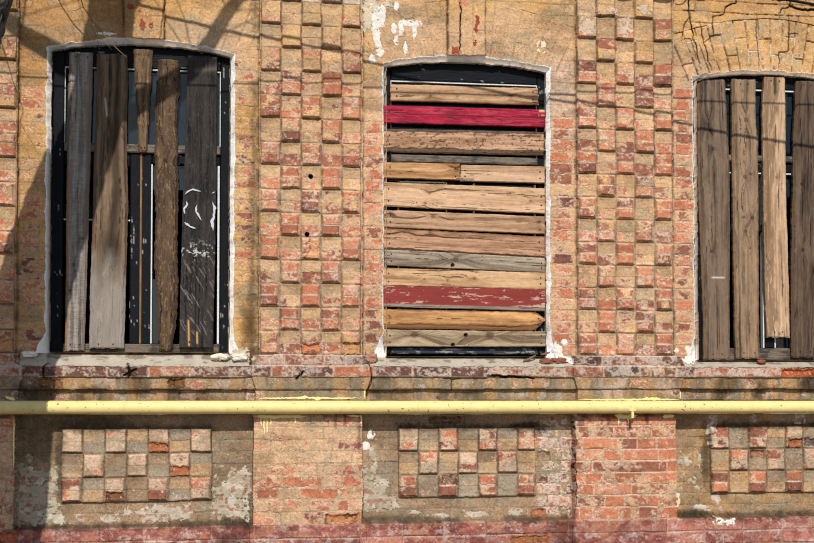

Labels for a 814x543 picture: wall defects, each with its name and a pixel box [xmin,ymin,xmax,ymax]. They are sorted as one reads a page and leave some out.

peeling [361,0,423,64]
crack [676,0,737,70]
crack [756,0,814,64]
peeling [0,453,66,543]
peeling [100,491,193,527]
peeling [209,462,255,522]